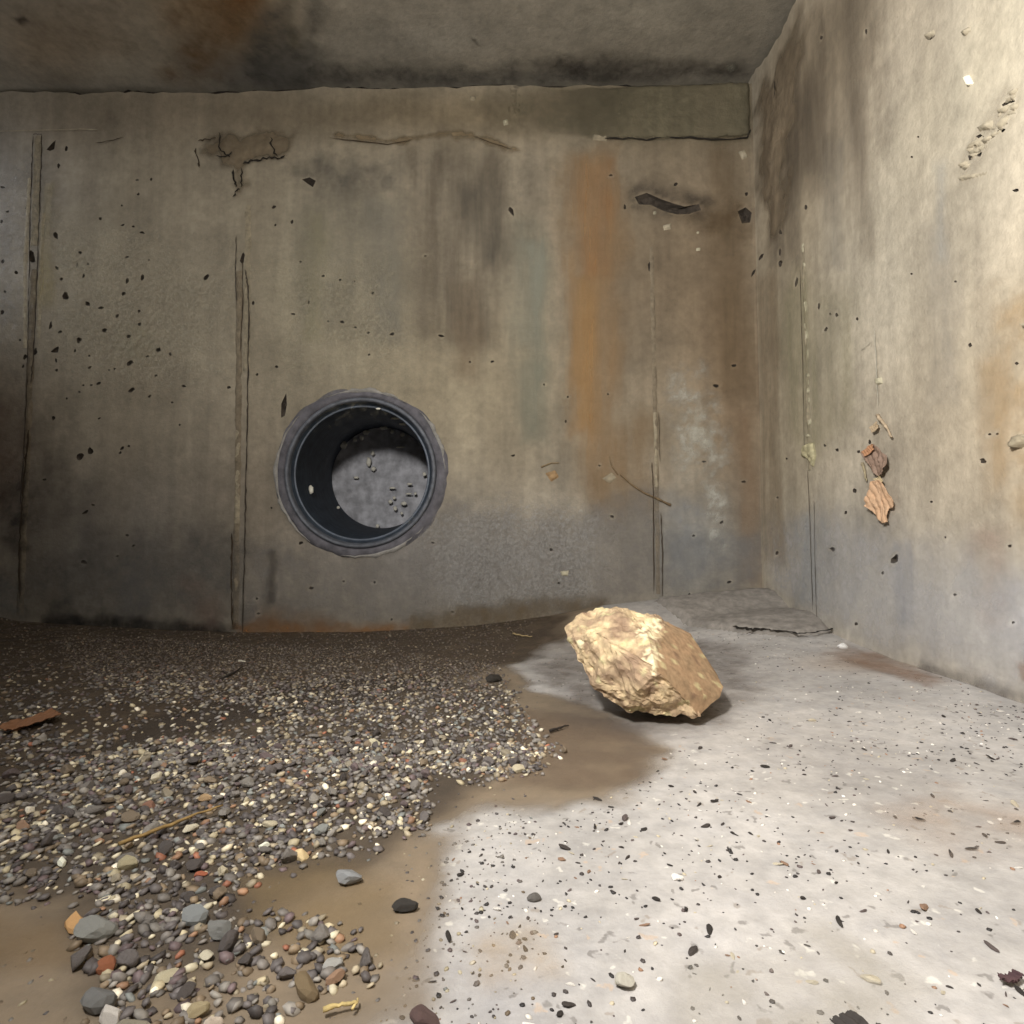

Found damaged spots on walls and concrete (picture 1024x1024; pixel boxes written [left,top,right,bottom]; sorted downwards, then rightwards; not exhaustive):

crack [335,137,411,145]
spalling [958,88,1019,181]
spalling [623,193,701,214]